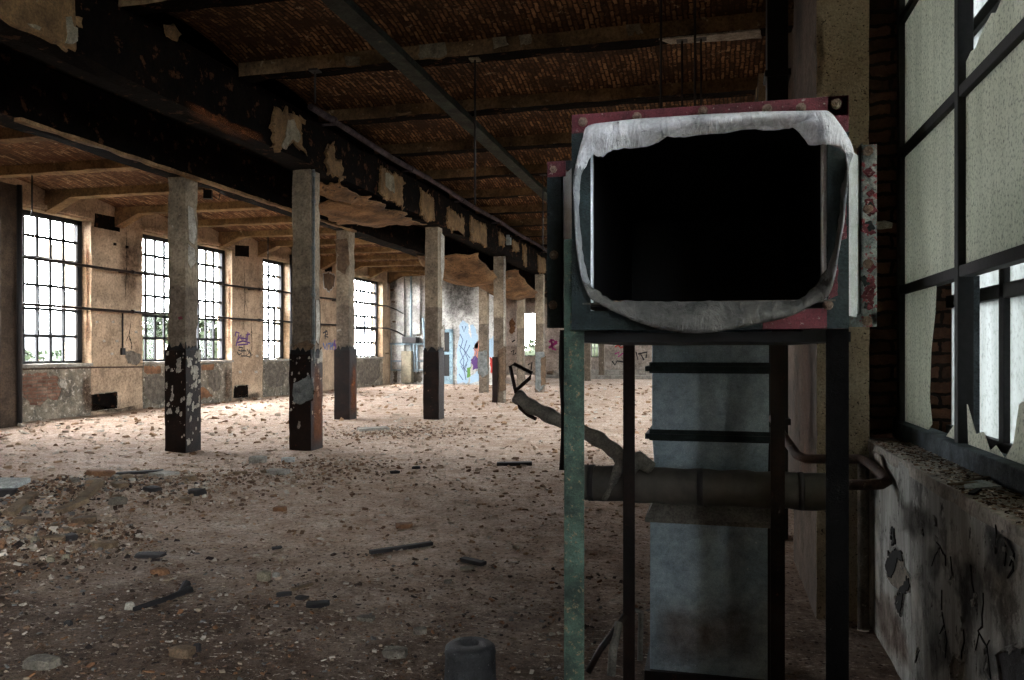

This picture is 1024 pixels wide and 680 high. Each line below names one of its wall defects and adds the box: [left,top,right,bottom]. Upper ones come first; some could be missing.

flaking render [0,0,83,52]
flaking render [269,106,308,156]
flaking render [324,141,346,183]
flaking render [378,163,406,211]
flaking render [419,187,546,290]
peeling [255,238,350,429]
flaking render [22,369,62,408]
peeling [103,340,223,446]
peeling [885,526,911,617]
crack [914,515,991,680]
crack [992,524,1017,579]